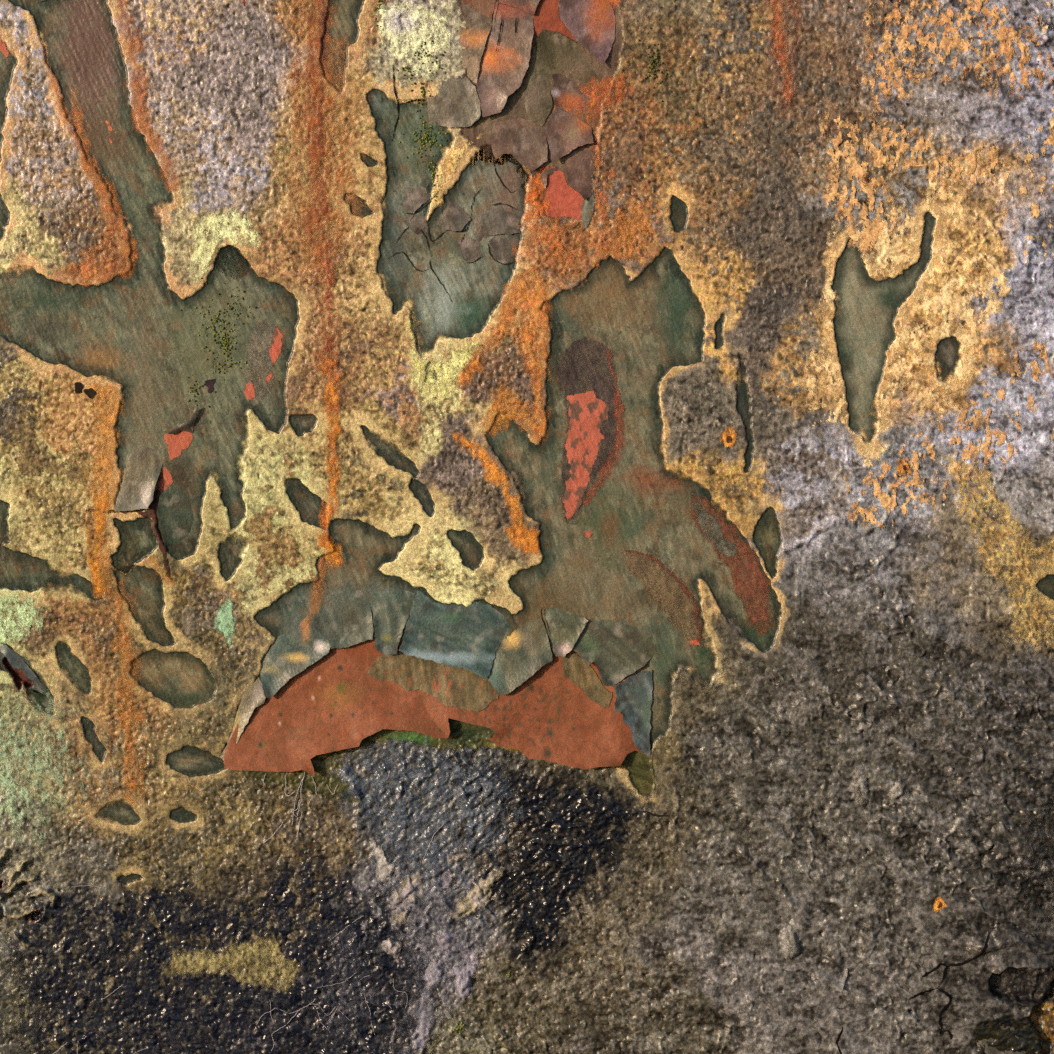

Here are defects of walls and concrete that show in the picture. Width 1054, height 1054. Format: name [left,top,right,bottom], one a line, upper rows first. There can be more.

rust [51,75,137,285]
peeling [0,0,318,715]
rust [292,0,355,599]
peeling [166,247,782,803]
peeling [344,0,626,352]
rust [453,434,539,554]
rust [459,140,651,442]
peeling [832,212,936,443]
leakage [0,740,650,1054]
crack [835,1027,843,1054]
crack [909,928,993,1039]
spalling [973,931,1054,1054]